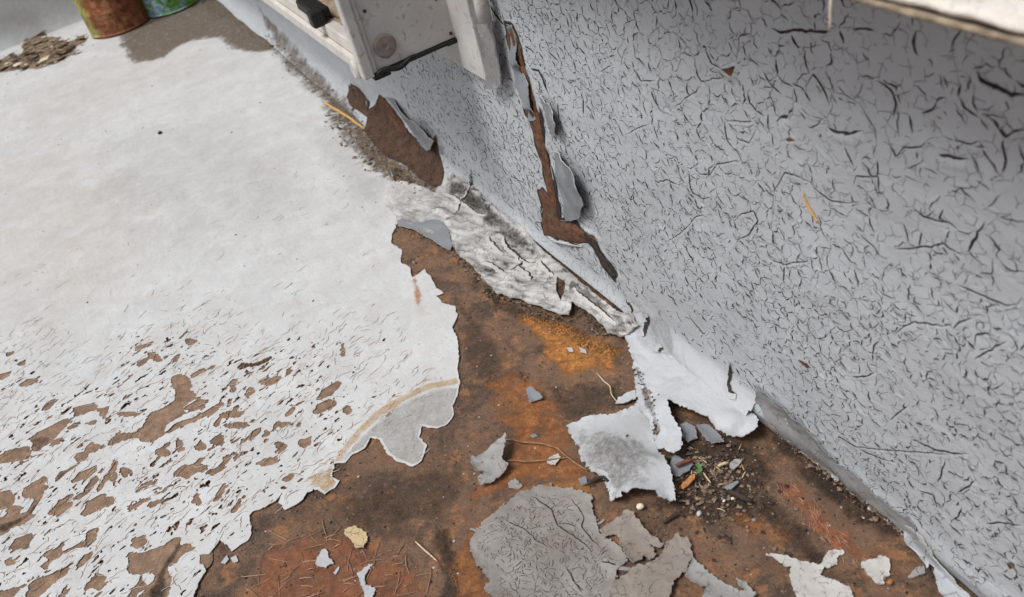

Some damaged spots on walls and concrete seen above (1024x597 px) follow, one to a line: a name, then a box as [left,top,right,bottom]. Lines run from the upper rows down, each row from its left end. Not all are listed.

water stain [120,0,436,192]
peeling [346,82,447,189]
rust [522,316,619,373]
crack [392,0,1024,597]
peeling [0,331,352,597]
crack [0,219,448,597]
rust [473,376,589,498]
peeling [469,287,769,597]
peeling [344,525,368,548]
rust [451,522,485,597]
peeling [765,548,853,597]
peeling [861,555,890,585]